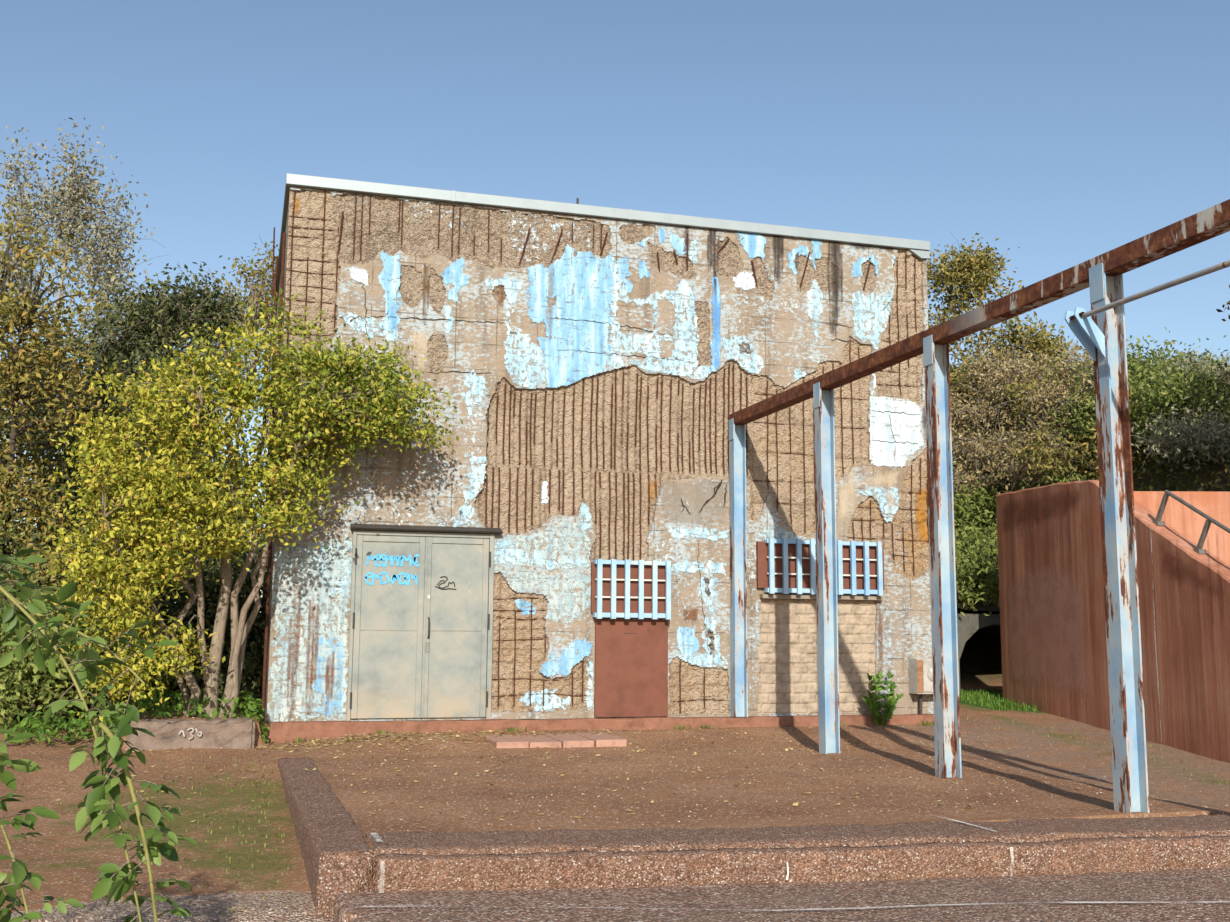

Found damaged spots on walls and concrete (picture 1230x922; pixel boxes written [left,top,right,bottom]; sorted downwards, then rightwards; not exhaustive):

spalling [267,190,930,722]
rust [916,490,928,542]